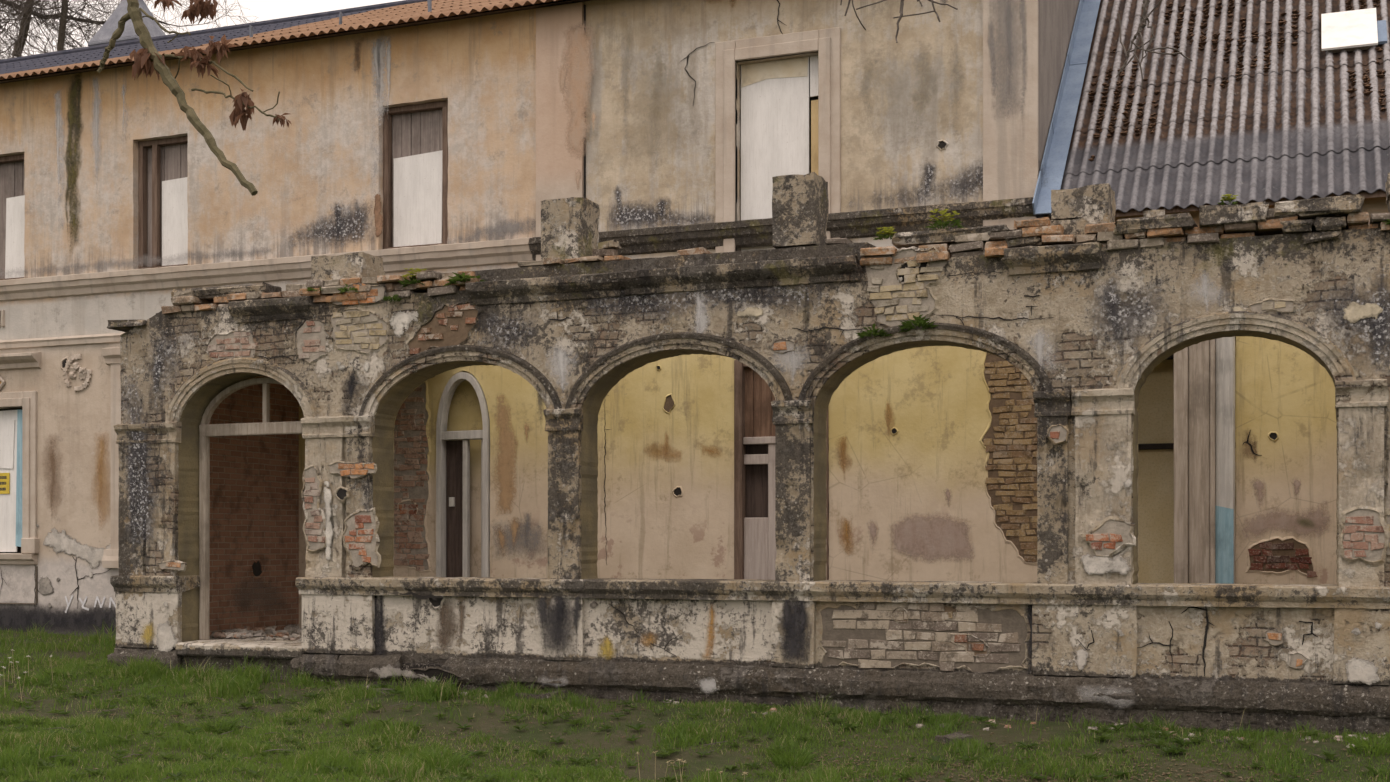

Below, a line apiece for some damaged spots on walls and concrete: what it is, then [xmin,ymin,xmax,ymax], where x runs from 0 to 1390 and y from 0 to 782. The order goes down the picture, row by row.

crack [680,42,714,104]
damp [55,73,100,239]
spalling [294,282,482,574]
spalling [979,352,1069,566]
peeling [868,490,973,560]
spalling [1245,448,1390,577]
damp [538,596,580,653]
damp [780,600,807,663]
crack [1137,607,1215,676]